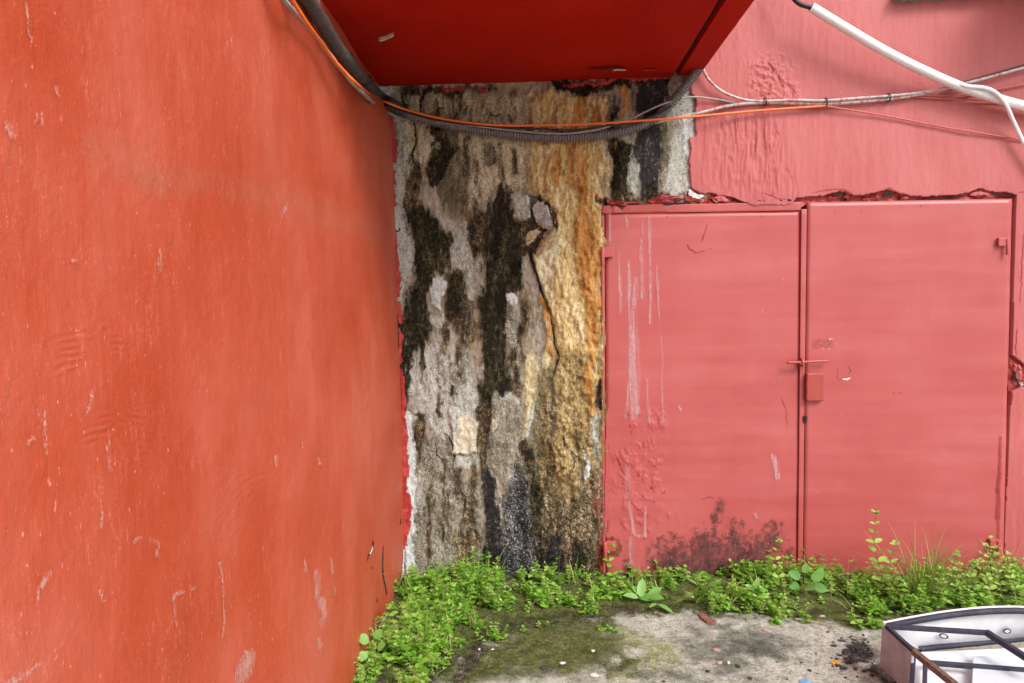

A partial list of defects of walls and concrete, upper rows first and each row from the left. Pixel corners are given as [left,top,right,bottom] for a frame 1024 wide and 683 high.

leakage [379,74,696,574]
crack [518,202,560,380]
corrosion [539,295,553,356]
corrosion [551,96,602,417]
flaking render [780,189,1016,208]
leakage [629,500,795,574]